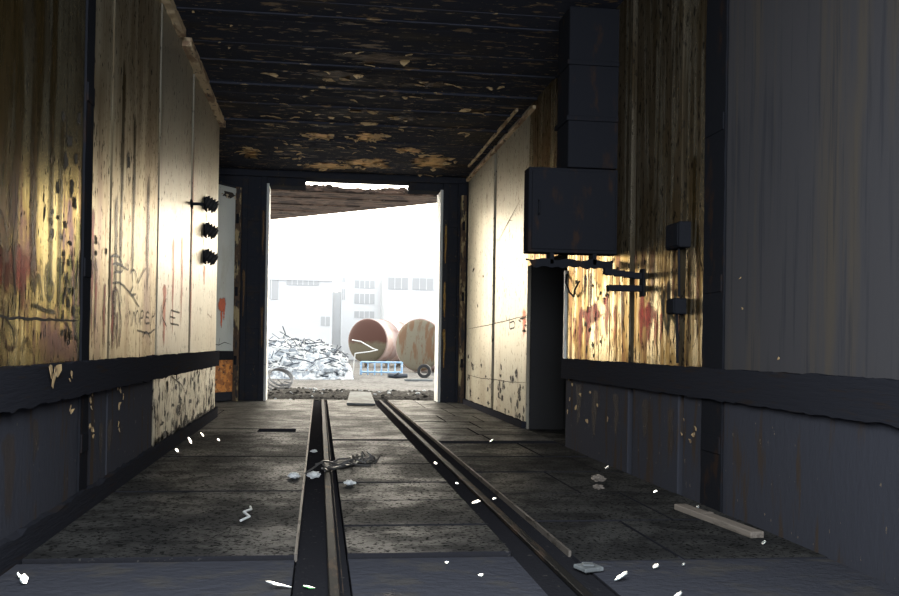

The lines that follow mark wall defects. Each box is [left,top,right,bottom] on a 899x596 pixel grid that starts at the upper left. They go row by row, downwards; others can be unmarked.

peeling [302,52,439,82]
water stain [0,0,64,320]
peeling [234,147,263,159]
peeling [261,99,423,171]
peeling [393,147,458,177]
peeling [153,368,214,447]